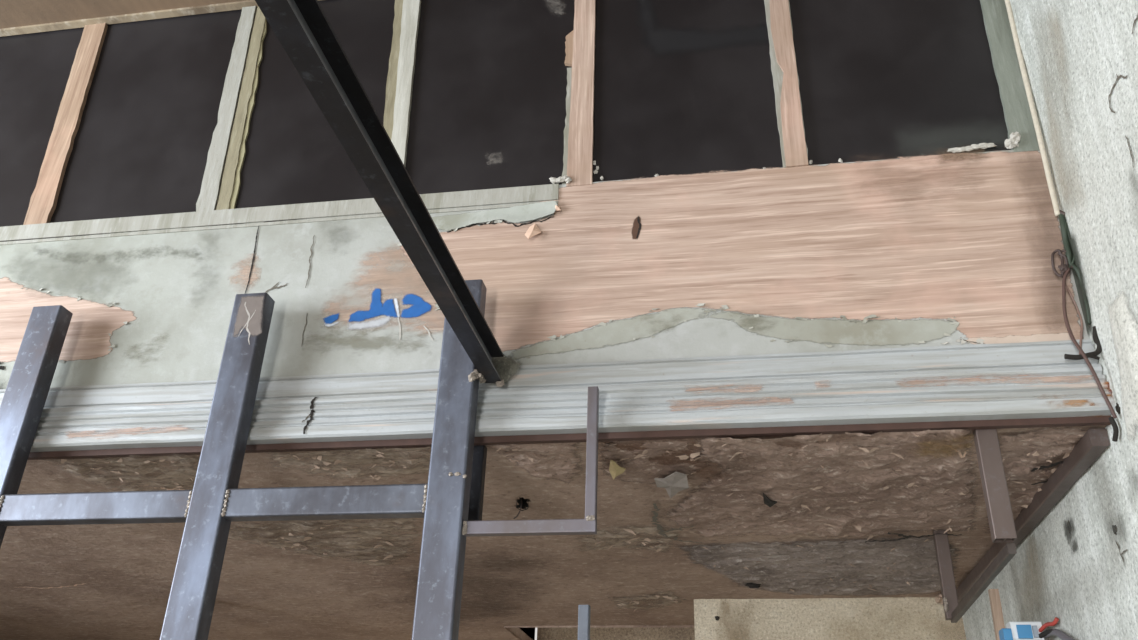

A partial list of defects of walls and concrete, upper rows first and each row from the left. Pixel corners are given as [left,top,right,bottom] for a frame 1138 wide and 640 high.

peeling [0,277,136,370]
peeling [325,243,445,333]
peeling [432,151,1083,359]
crack [302,397,317,434]